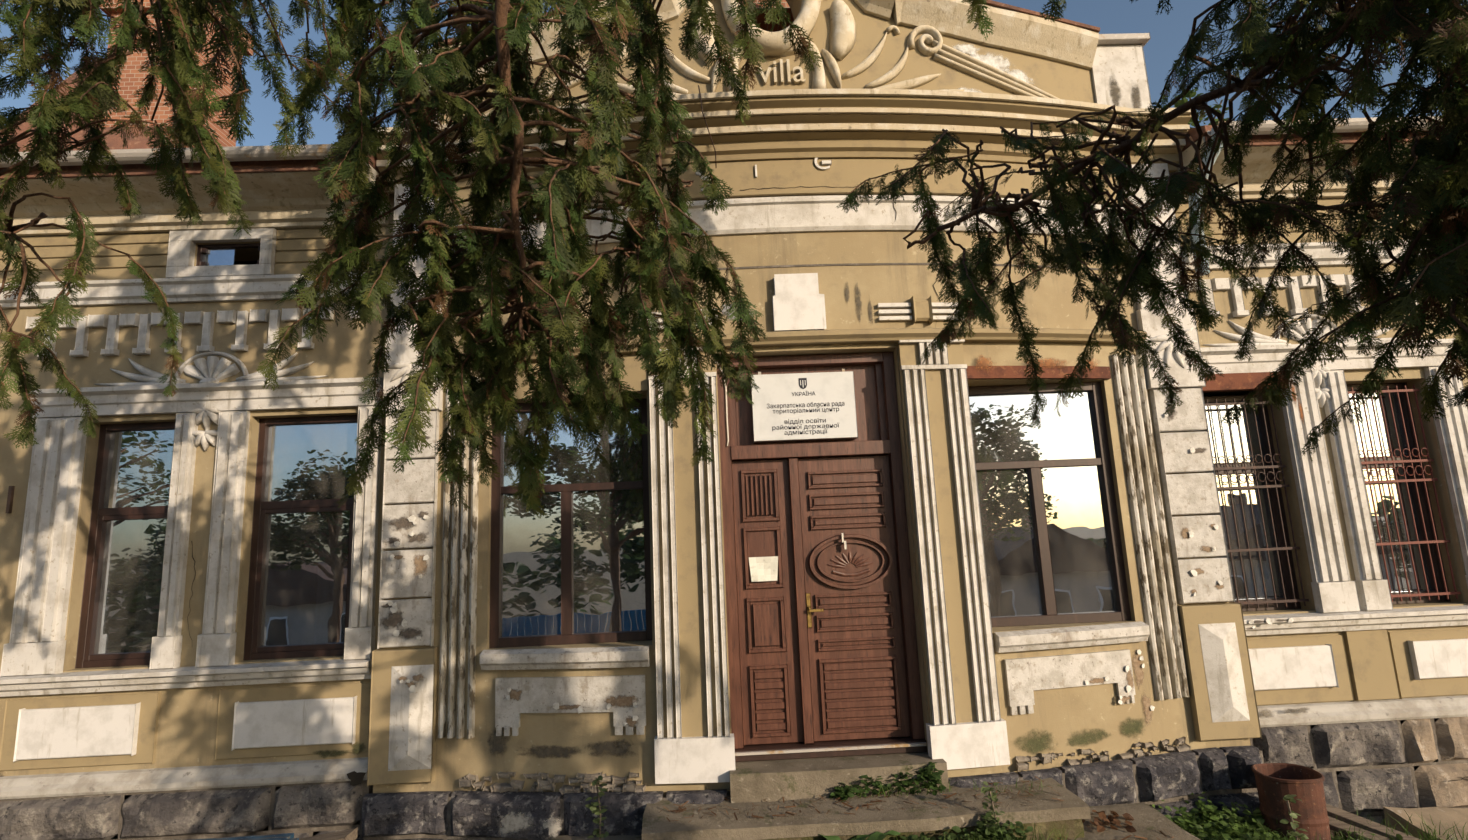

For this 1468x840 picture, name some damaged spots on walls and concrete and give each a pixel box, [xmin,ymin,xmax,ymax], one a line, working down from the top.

peeling [388,511,430,578]
peeling [382,601,422,640]
peeling [506,687,522,701]
peeling [553,703,583,714]
peeling [605,695,641,727]
spalling [1085,649,1155,722]
spalling [1015,736,1191,772]